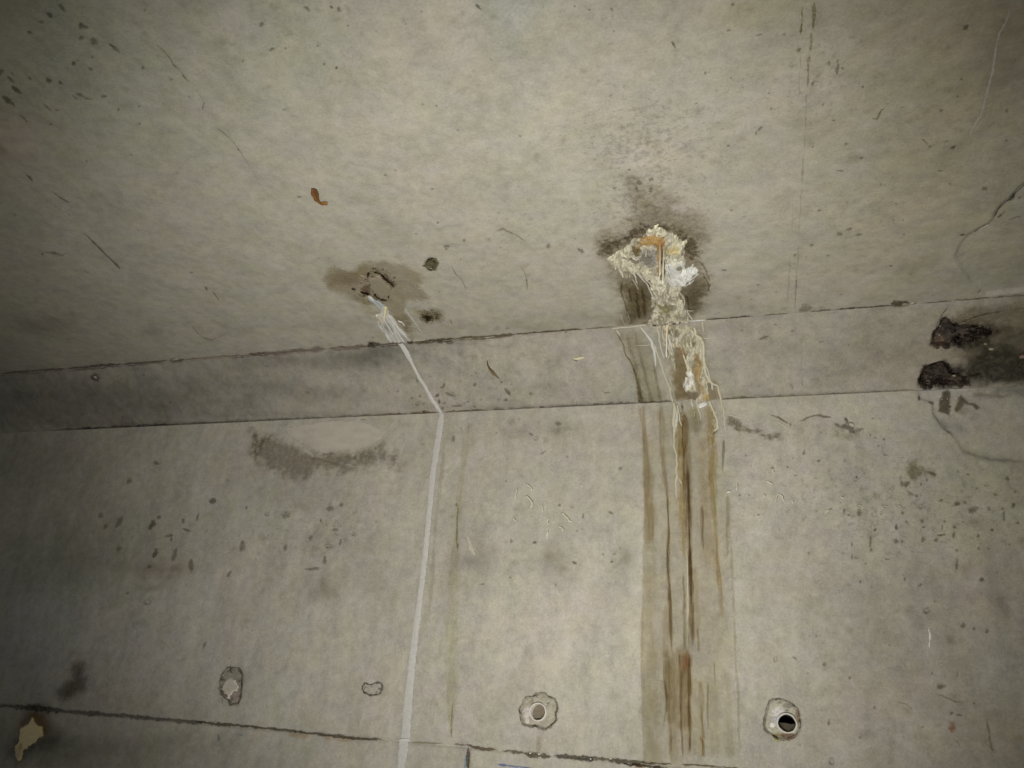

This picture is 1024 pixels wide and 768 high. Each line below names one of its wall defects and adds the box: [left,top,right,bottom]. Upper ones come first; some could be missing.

water stain [607,224,726,498]
spalling [15,717,44,761]